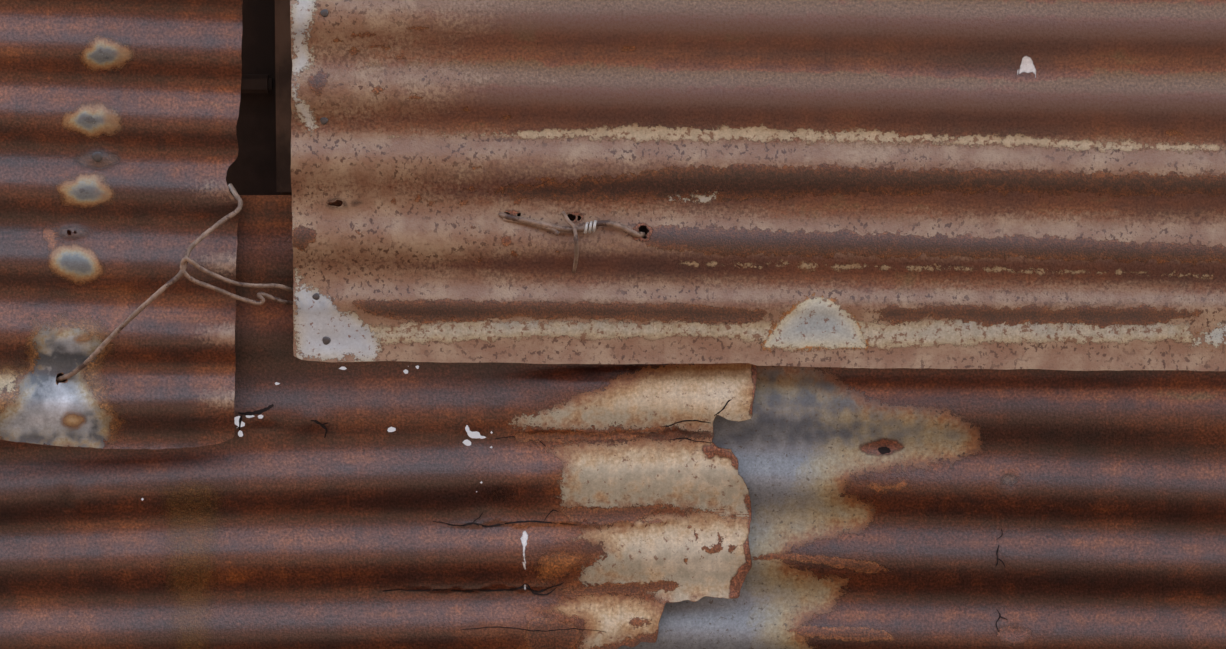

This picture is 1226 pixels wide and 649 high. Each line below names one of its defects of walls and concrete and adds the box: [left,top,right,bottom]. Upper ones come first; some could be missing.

corrosion [458,162,1226,206]
corrosion [292,225,317,252]
corrosion [624,224,1226,266]
peeling [294,268,382,362]
corrosion [352,298,767,324]
corrosion [863,303,1203,330]
peeling [1189,319,1226,352]
peeling [0,323,117,449]
corrosion [0,310,131,445]
peeling [508,293,985,649]
corrosion [753,553,892,574]
corrosion [787,624,894,642]